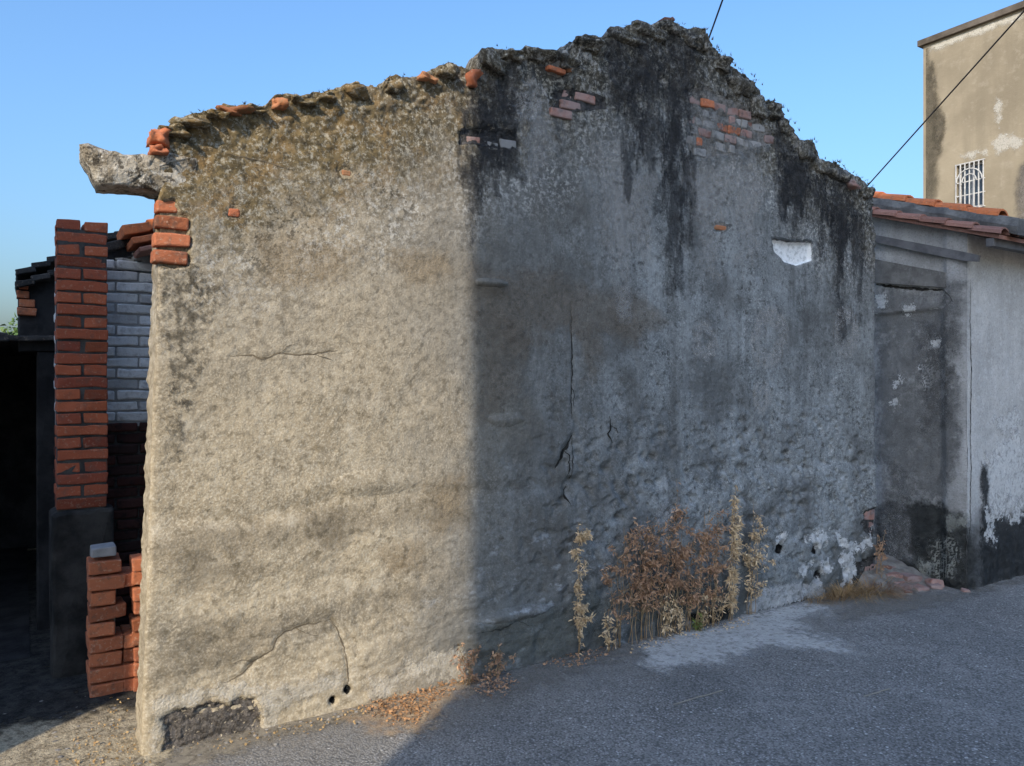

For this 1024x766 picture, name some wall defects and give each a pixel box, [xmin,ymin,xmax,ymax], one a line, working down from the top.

flaking render [459,128,519,150]
flaking render [544,61,606,120]
flaking render [685,86,774,160]
spalling [771,236,812,266]
crack [230,344,337,360]
crack [555,316,575,503]
leakage [875,281,1024,589]
peeling [984,406,1024,544]
peeling [775,531,789,554]
peeling [798,507,970,591]
crack [223,619,349,684]
flaking render [160,696,262,750]